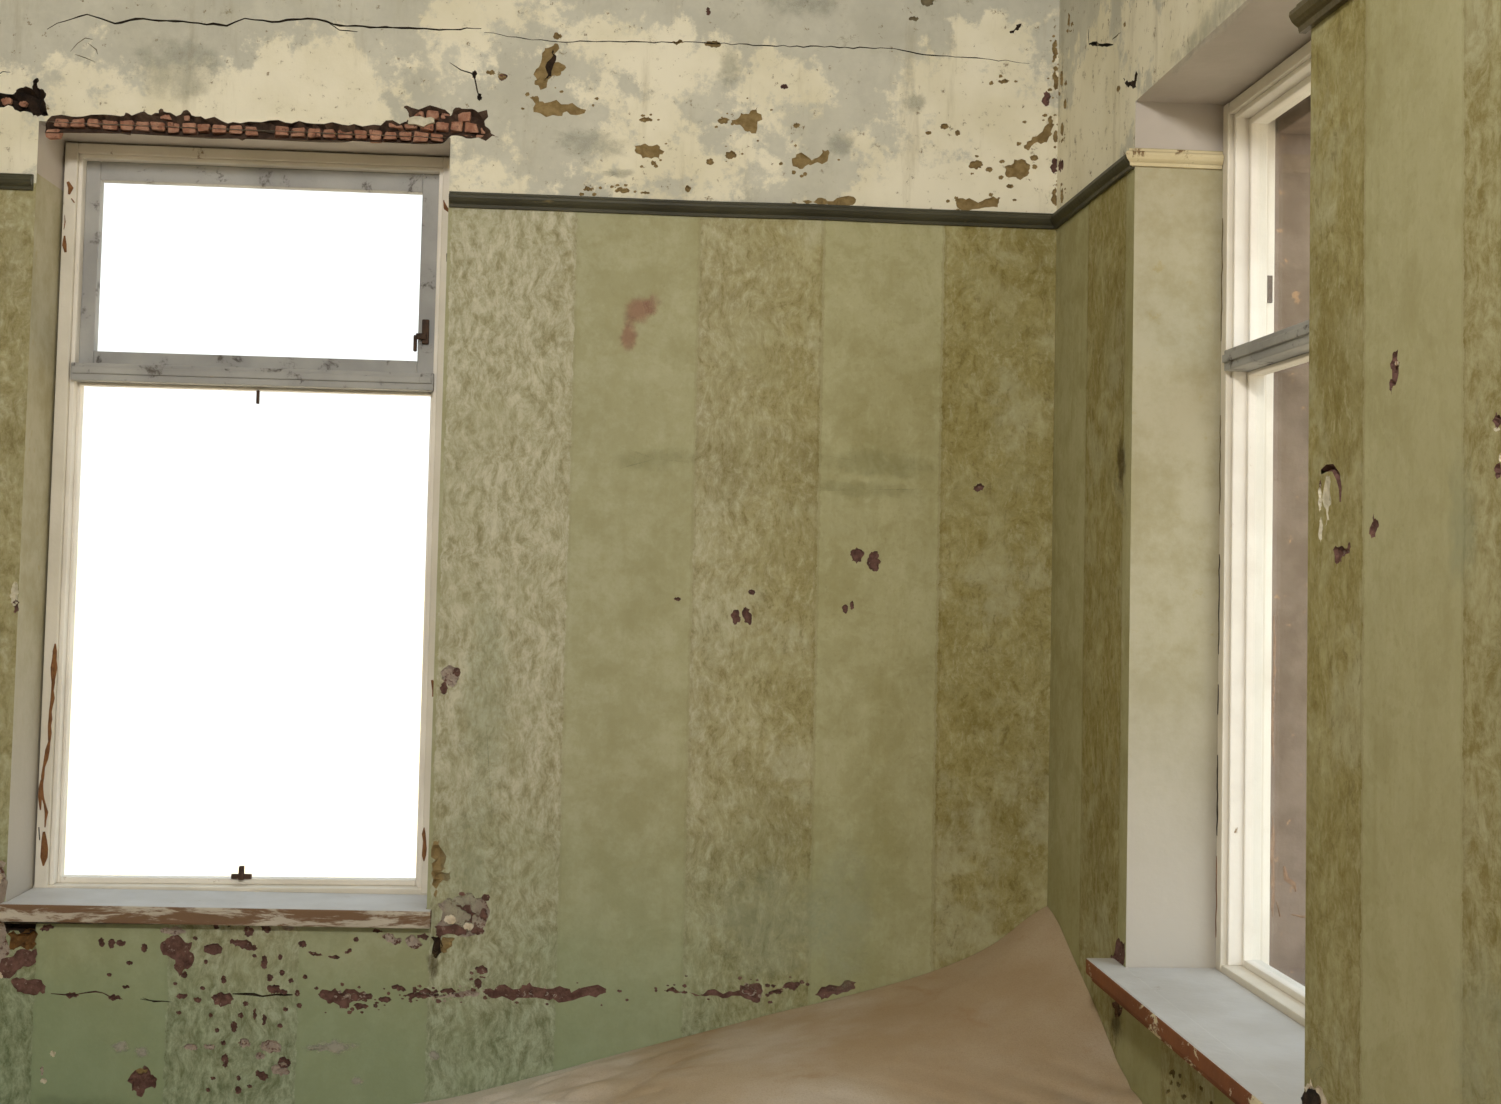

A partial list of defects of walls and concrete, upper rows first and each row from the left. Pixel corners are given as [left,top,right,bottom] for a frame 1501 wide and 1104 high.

flaking render [0,78,495,144]
crack [48,14,1029,101]
flaking render [521,32,599,117]
flaking render [635,143,667,168]
flaking render [706,97,773,165]
flaking render [779,123,840,178]
flaking render [946,13,1126,210]
peeling [1318,464,1351,564]
peeling [0,861,54,995]
peeling [98,841,628,1097]
peeling [654,975,856,1003]
peeling [1301,1051,1328,1104]